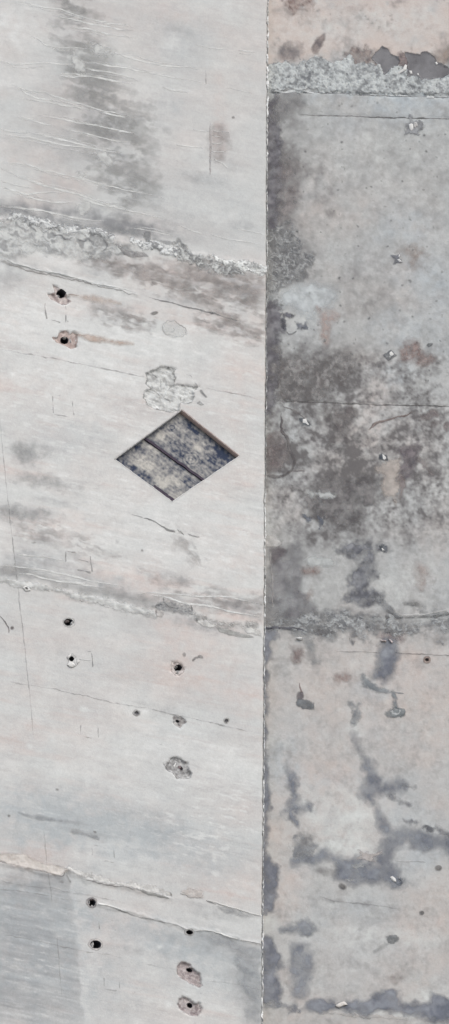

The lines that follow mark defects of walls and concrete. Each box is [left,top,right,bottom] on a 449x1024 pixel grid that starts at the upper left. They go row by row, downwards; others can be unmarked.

corrosion [74,334,126,344]
spalling [143,366,206,412]
spalling [217,0,449,1024]
damp [303,460,400,529]
damp [339,541,394,613]
damp [262,545,314,914]
spalling [164,757,192,779]
damp [285,761,449,888]
crack [0,861,214,904]
spalling [177,962,202,987]
spalling [178,998,202,1016]
damp [212,921,449,1022]